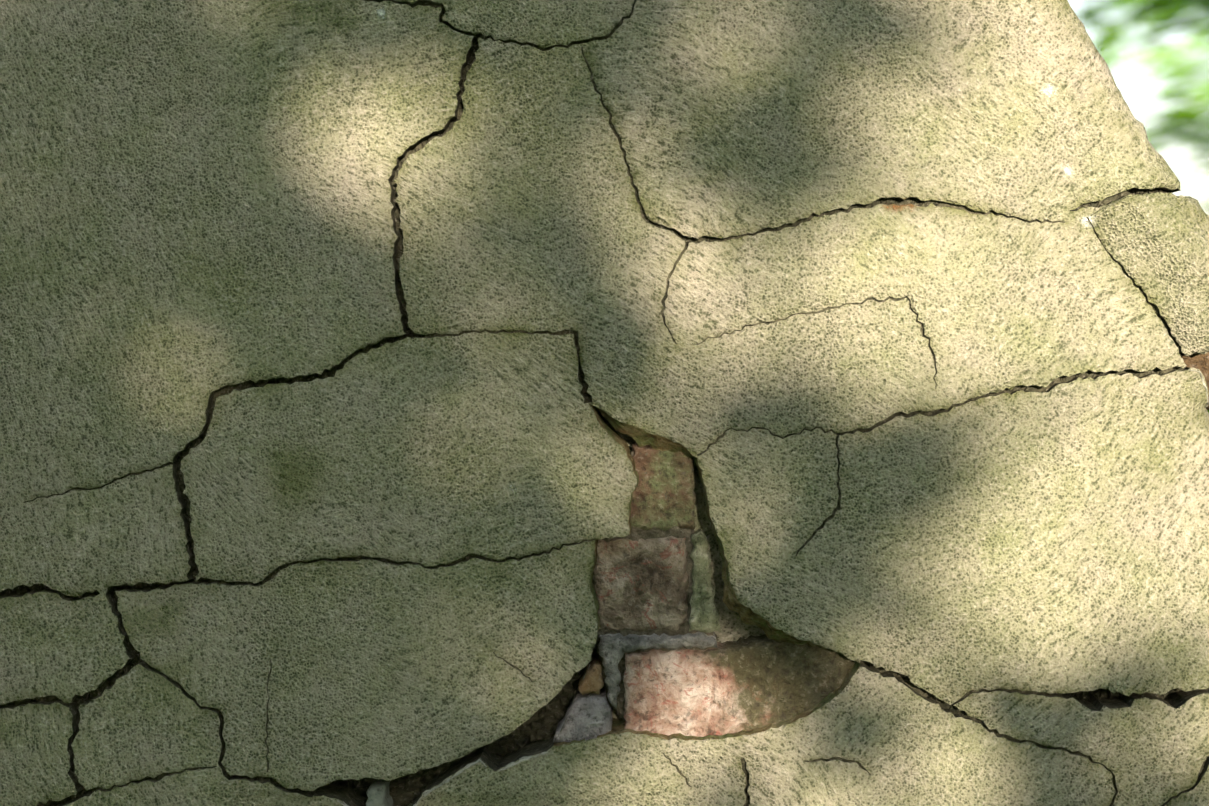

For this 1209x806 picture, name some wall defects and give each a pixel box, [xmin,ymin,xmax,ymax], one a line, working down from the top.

crack [581,47,1065,344]
crack [0,0,636,806]
crack [692,187,1189,556]
spalling [553,404,861,747]
crack [663,753,691,787]
crack [740,758,750,806]
crack [804,757,871,775]
crack [860,660,1209,806]